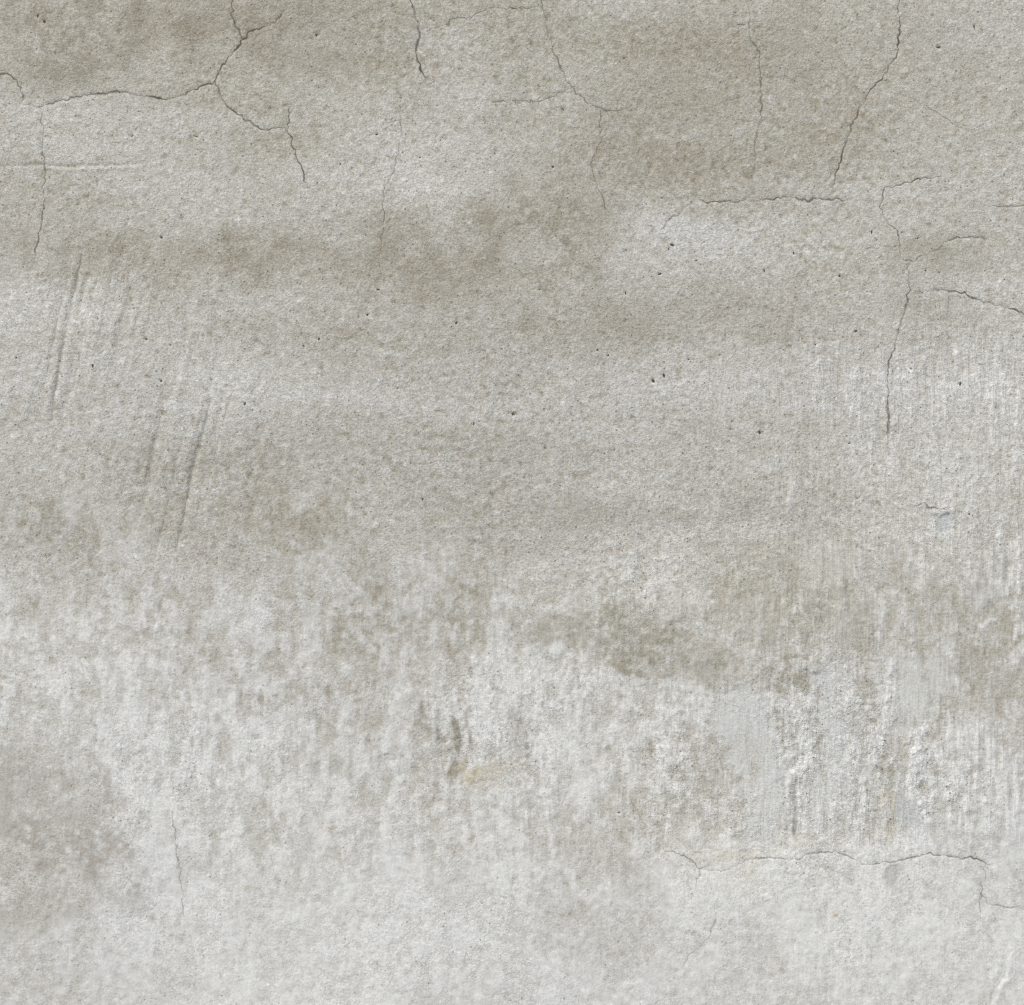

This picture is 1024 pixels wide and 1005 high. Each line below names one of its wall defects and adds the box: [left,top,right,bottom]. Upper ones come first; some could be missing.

crack [149,14,282,100]
leakage [506,484,913,779]
leakage [944,498,1024,636]
leakage [961,720,1024,821]